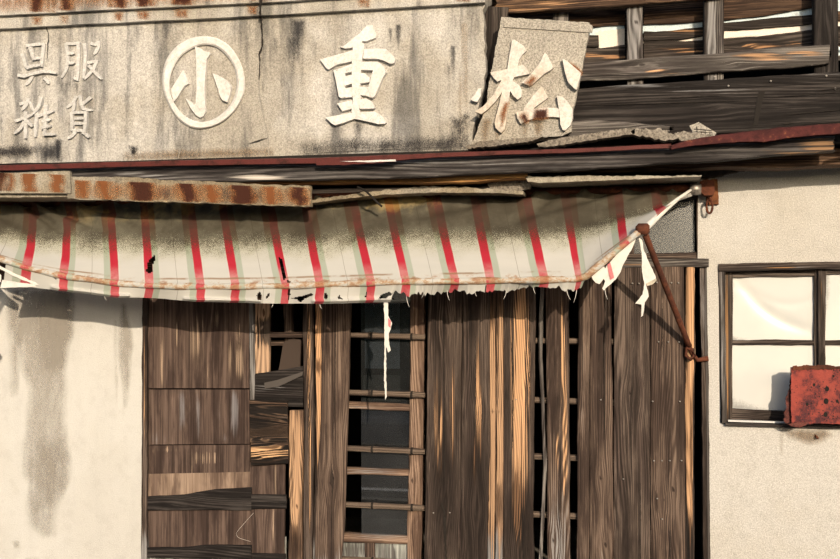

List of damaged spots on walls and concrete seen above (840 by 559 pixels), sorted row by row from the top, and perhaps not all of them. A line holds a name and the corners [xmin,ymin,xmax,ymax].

corrosion [0,0,154,25]
corrosion [164,0,191,17]
crack [248,0,269,156]
corrosion [520,109,548,133]
corrosion [0,173,38,192]
corrosion [50,174,65,193]
corrosion [75,180,308,205]
leakage [122,307,131,377]
leakage [14,290,70,495]